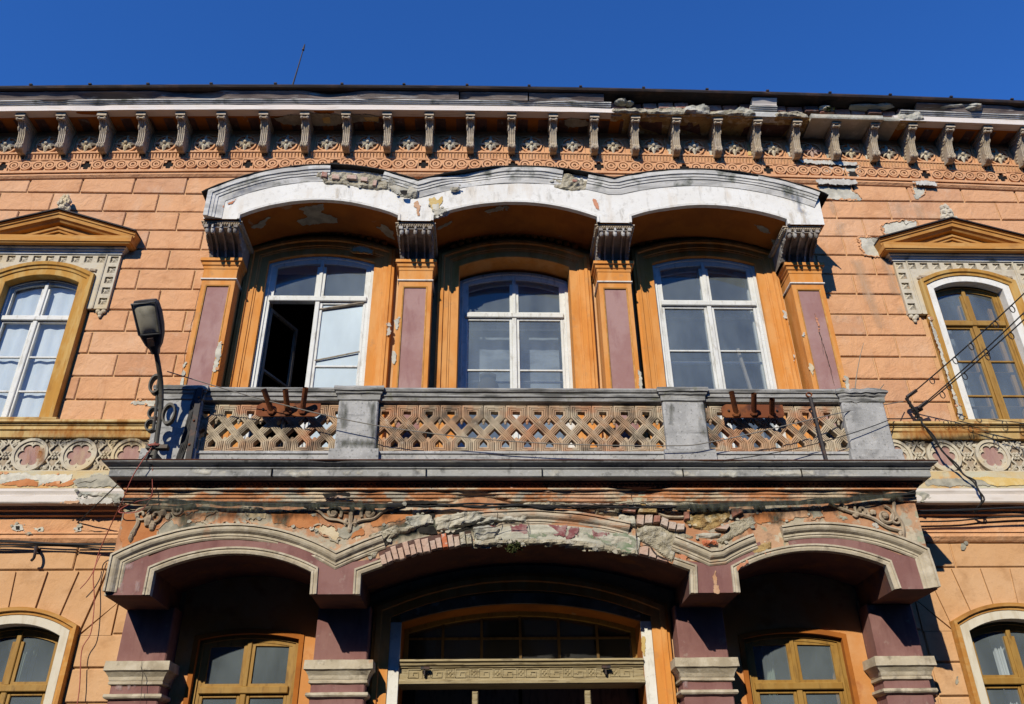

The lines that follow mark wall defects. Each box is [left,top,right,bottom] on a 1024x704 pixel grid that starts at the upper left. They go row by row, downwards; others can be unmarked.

spalling [316,171,461,230]
spalling [550,173,587,191]
peeling [785,145,868,201]
peeling [857,219,917,258]
spalling [0,471,825,571]